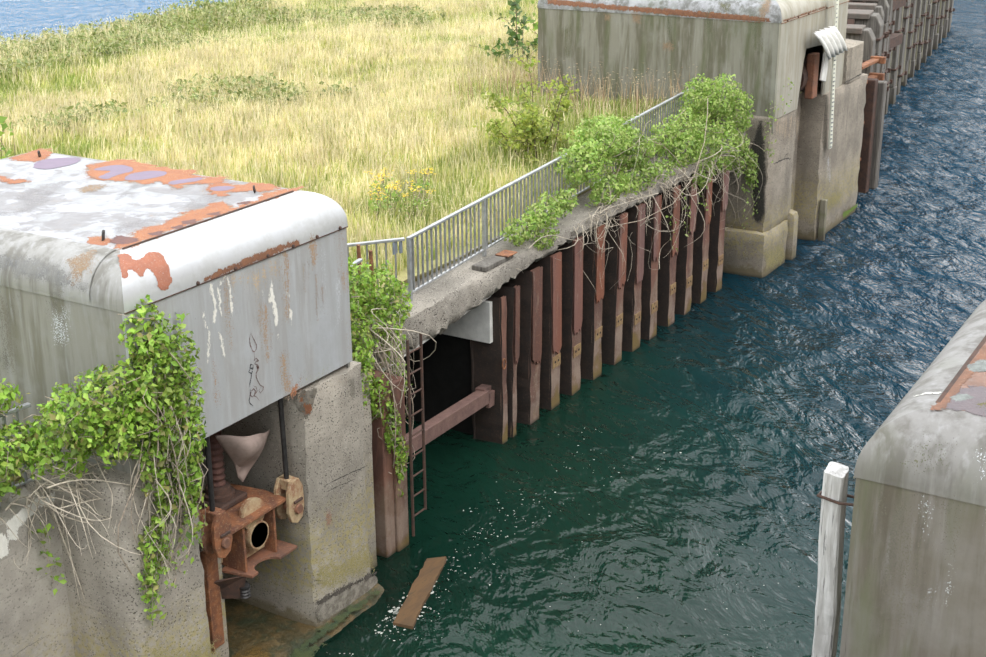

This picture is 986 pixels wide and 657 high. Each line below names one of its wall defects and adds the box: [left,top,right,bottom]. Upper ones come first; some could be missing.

peeling [33,157,81,169]
rust [65,158,309,286]
rust [204,233,318,401]
rust [930,345,986,410]